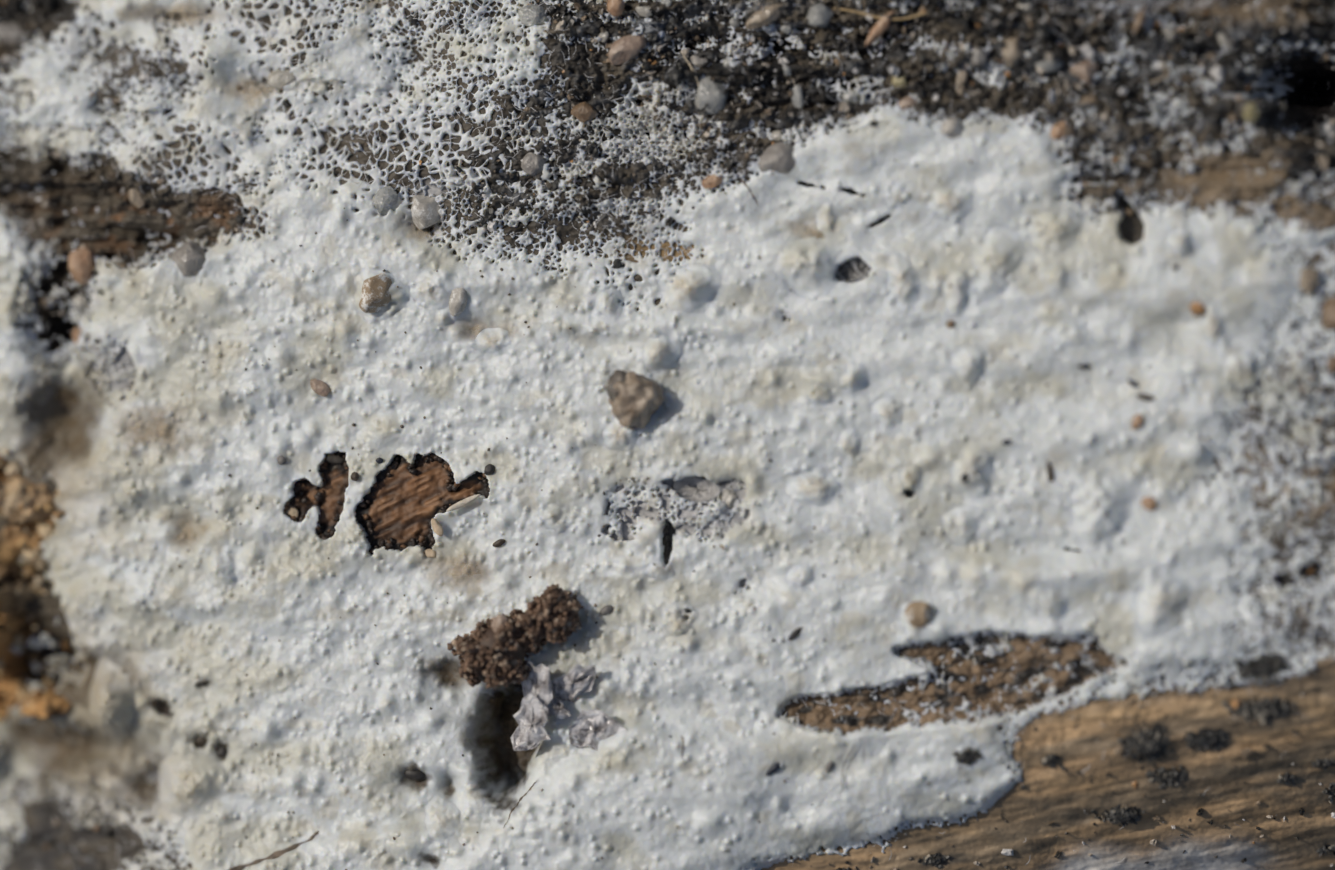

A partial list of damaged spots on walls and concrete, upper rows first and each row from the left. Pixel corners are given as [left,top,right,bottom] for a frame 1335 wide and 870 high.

damp [22,380,97,477]
damp [128,412,172,442]
peeling [283,451,490,558]
damp [54,656,99,702]
damp [429,660,466,686]
damp [10,712,98,796]
damp [130,757,160,800]
damp [476,689,522,763]